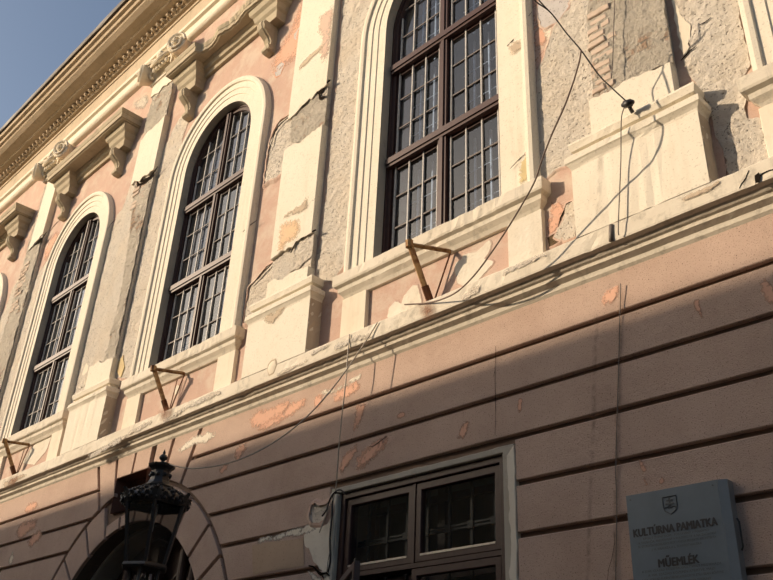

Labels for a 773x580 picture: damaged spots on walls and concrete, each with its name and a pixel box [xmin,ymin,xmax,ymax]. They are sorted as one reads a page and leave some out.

spalling [262,0,372,285]
spalling [533,0,769,200]
spalling [71,116,189,404]
spalling [242,261,273,328]
peeling [251,374,361,431]
peeling [252,497,335,580]